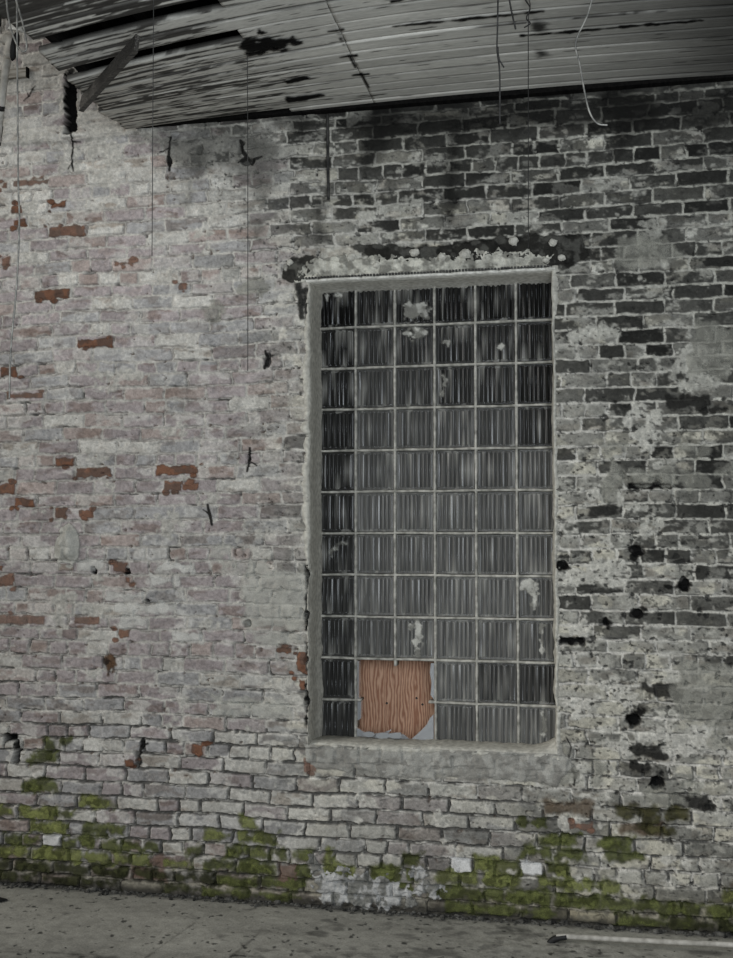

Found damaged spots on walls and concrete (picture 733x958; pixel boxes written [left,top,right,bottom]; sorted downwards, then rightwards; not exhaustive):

spalling [63,68,78,133]
spalling [351,233,589,270]
spalling [282,255,315,283]
damp [702,406,726,416]
spalling [630,545,643,562]
spalling [664,579,692,591]
spalling [626,708,646,725]
spalling [6,733,22,764]
spalling [648,775,665,789]
damp [43,834,62,846]
damp [450,857,471,873]
damp [520,859,542,875]